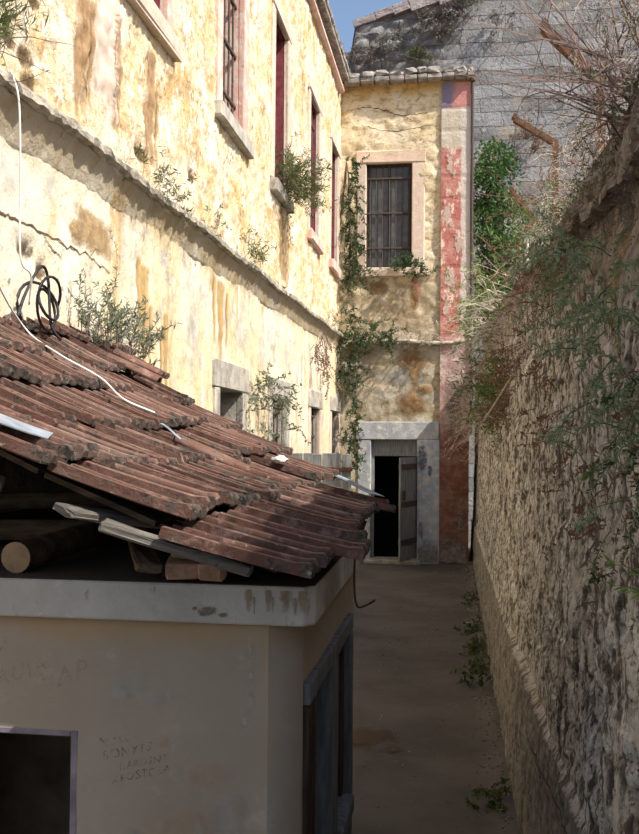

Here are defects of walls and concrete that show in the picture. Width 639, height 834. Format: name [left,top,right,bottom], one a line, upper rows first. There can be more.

damp [74,0,96,110]
damp [113,15,123,128]
crack [353,107,433,137]
crack [0,211,110,273]
peeling [444,200,465,255]
damp [376,348,432,413]